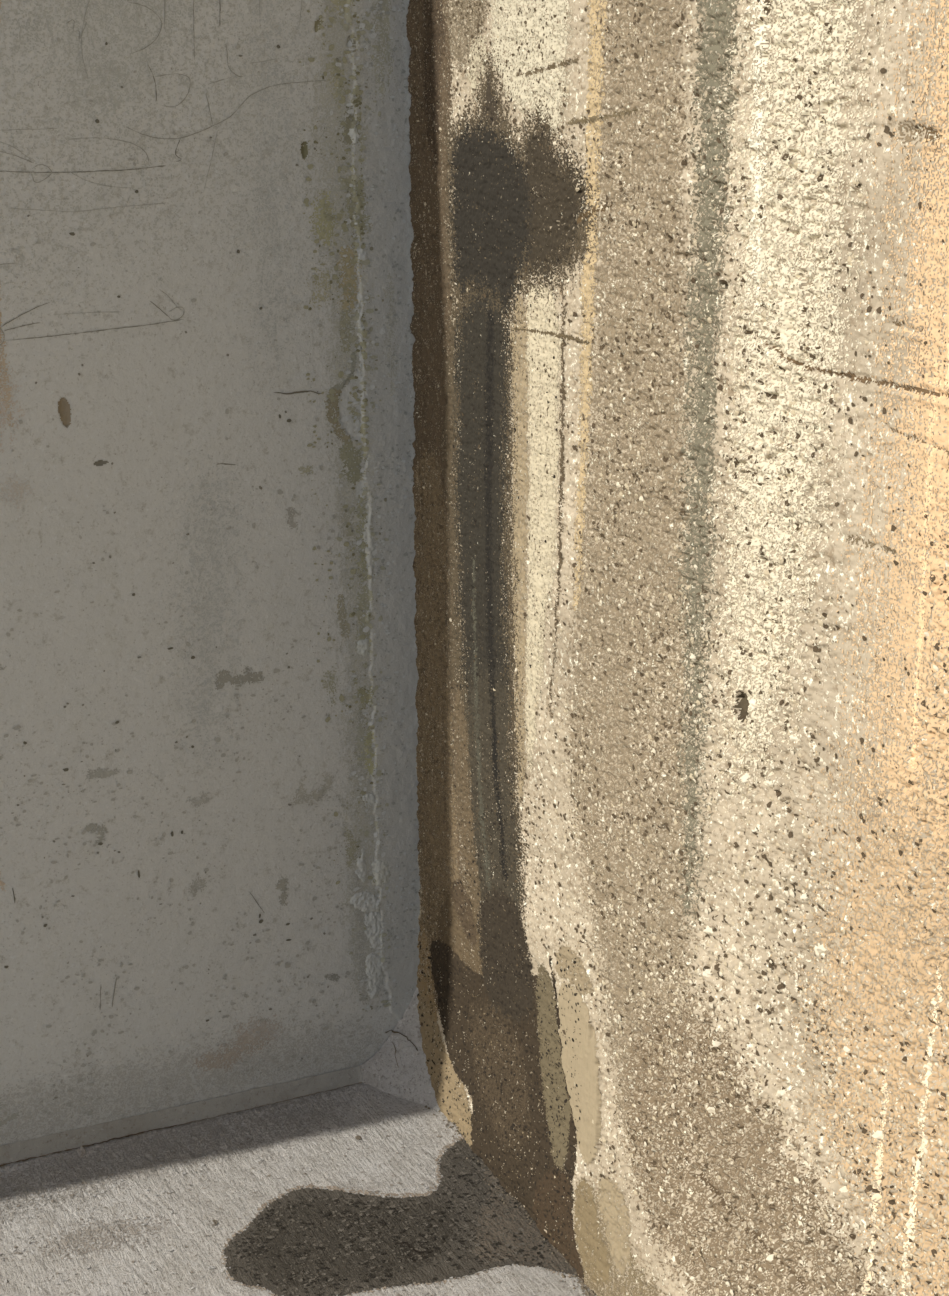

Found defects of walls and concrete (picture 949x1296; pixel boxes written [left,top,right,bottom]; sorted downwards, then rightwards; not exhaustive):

crack [513,326,590,345]
crack [765,341,949,397]
crack [890,427,949,455]